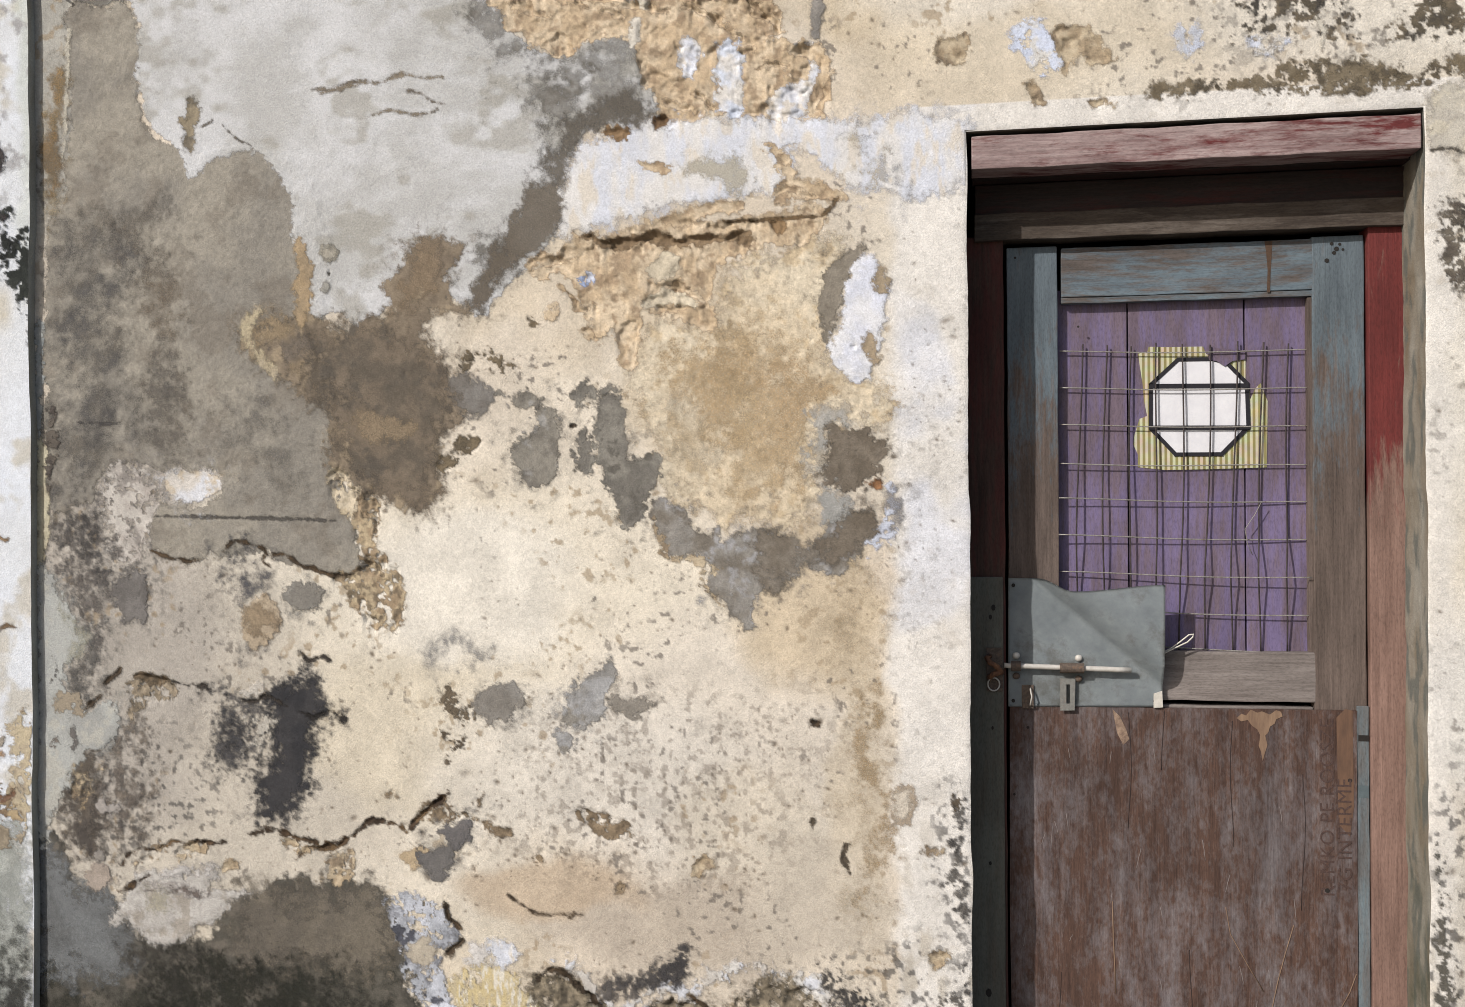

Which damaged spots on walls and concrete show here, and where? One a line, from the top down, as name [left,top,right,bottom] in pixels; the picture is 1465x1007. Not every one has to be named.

flaking render [486,0,835,130]
water stain [1144,0,1465,101]
water stain [236,235,495,516]
flaking render [524,142,899,535]
crack [150,539,351,579]
crack [171,680,347,725]
water stain [197,663,348,829]
crack [298,650,331,663]
water stain [0,713,421,1007]
crack [117,789,450,893]
flaking render [575,808,632,840]
peeling [382,890,461,1007]